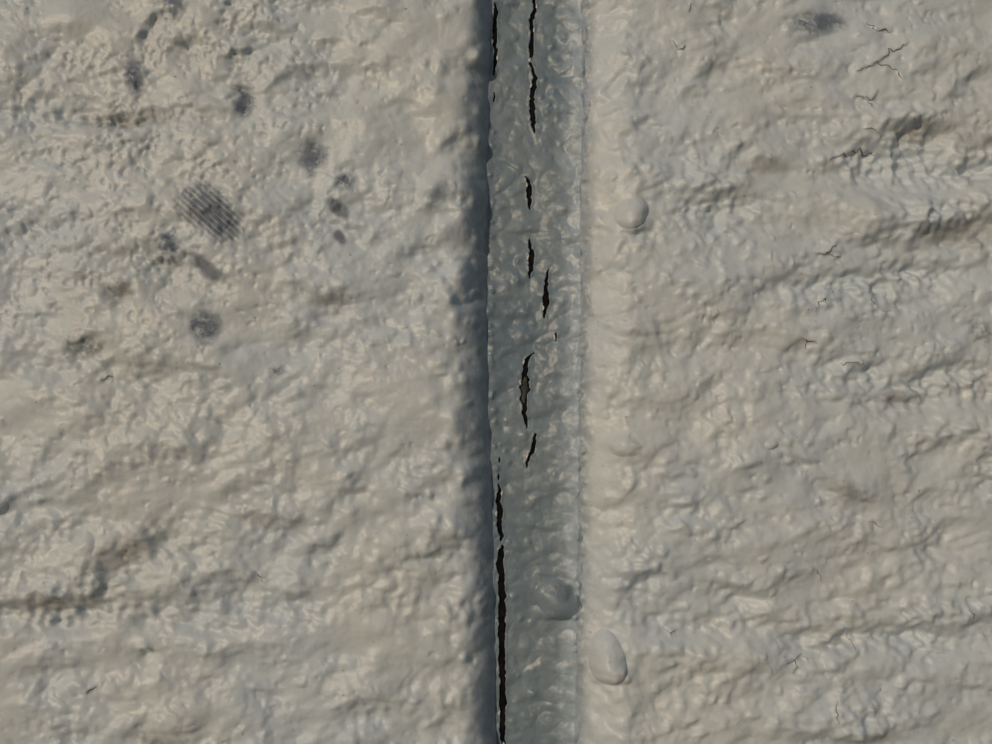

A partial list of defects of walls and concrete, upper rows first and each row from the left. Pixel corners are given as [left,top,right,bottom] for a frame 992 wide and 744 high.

crack [491,3,499,102]
crack [528,0,538,133]
crack [858,23,909,79]
crack [832,93,883,158]
crack [524,176,532,210]
crack [527,239,557,341]
crack [519,353,537,468]
crack [495,457,507,744]